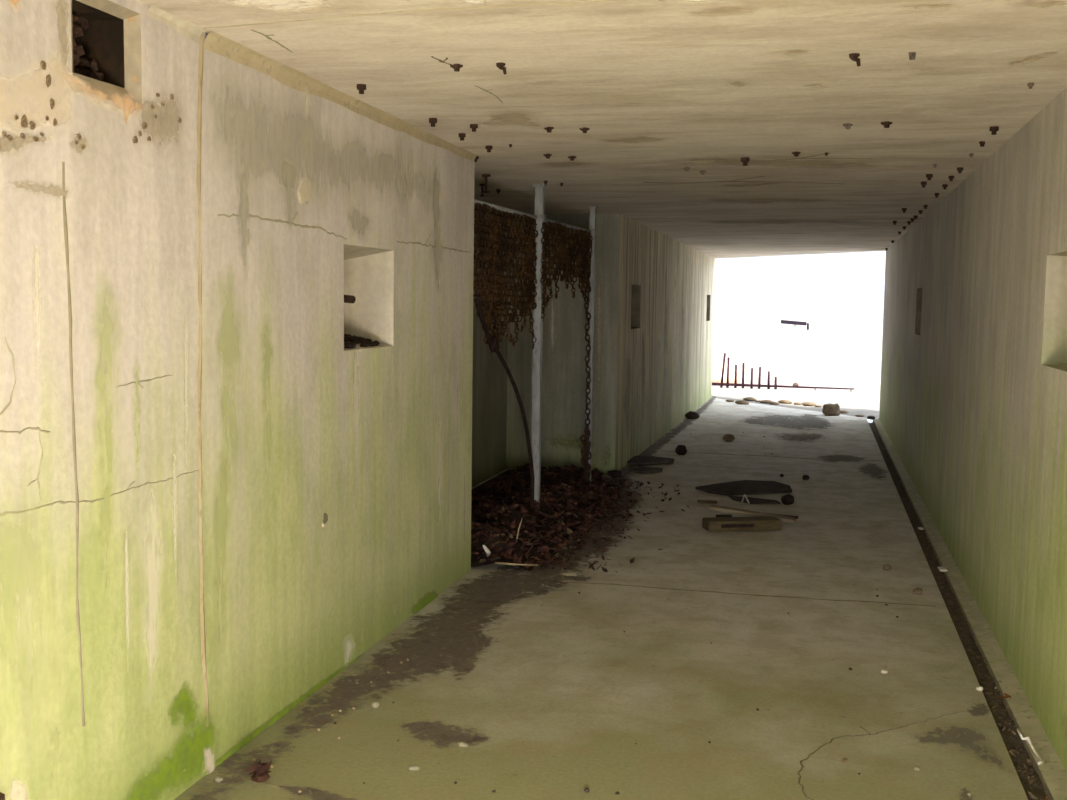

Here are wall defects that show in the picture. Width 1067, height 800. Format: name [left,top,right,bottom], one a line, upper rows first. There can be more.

peeling [0,55,102,148]
spalling [71,134,86,152]
spalling [132,93,182,143]
crack [218,213,347,240]
crack [396,234,470,253]
crack [0,337,200,516]
leakage [147,532,159,663]
leakage [205,749,214,773]
crack [798,709,974,800]
leakage [915,726,1003,766]